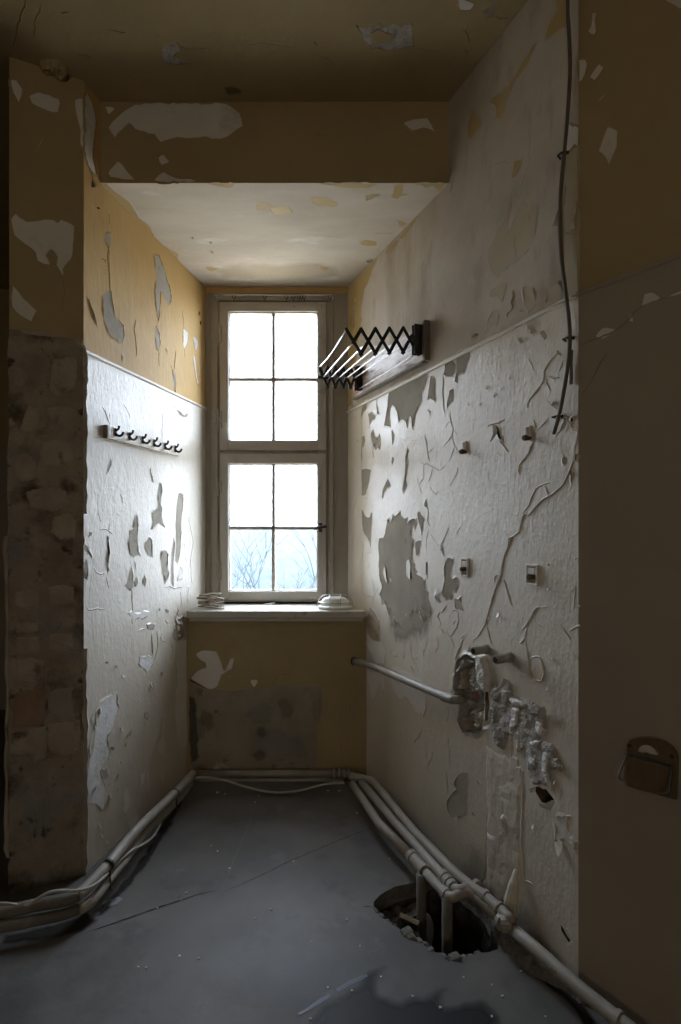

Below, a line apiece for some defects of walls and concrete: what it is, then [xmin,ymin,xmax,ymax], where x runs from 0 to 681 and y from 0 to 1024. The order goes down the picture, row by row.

peeling [355,21,415,52]
peeling [8,78,244,352]
peeling [596,125,621,166]
spalling [2,283,132,894]
peeling [125,468,184,591]
peeling [348,213,480,700]
crack [437,353,609,682]
peeling [128,608,235,755]
leakage [189,698,198,761]
peeling [446,770,475,819]
spalling [451,650,579,857]